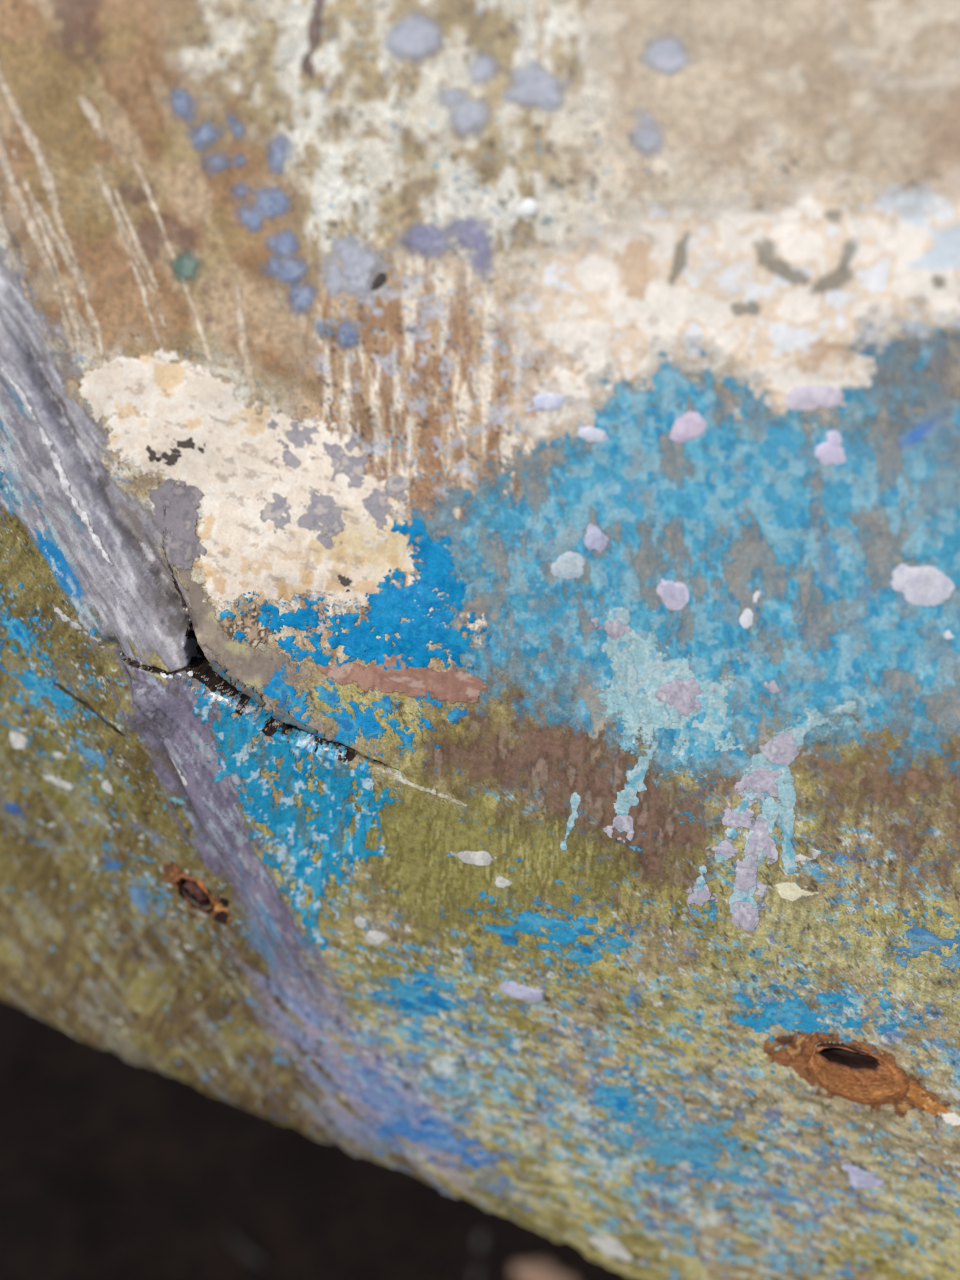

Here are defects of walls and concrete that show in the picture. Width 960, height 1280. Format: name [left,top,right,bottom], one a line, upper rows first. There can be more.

crack [99,537,467,806]
peeling [79,167,960,1012]
corrosion [163,862,231,925]
peeling [351,947,549,1072]
peeling [361,1023,897,1231]
peeling [720,906,960,1074]
corrosion [763,1031,950,1119]
peeling [589,1235,693,1280]